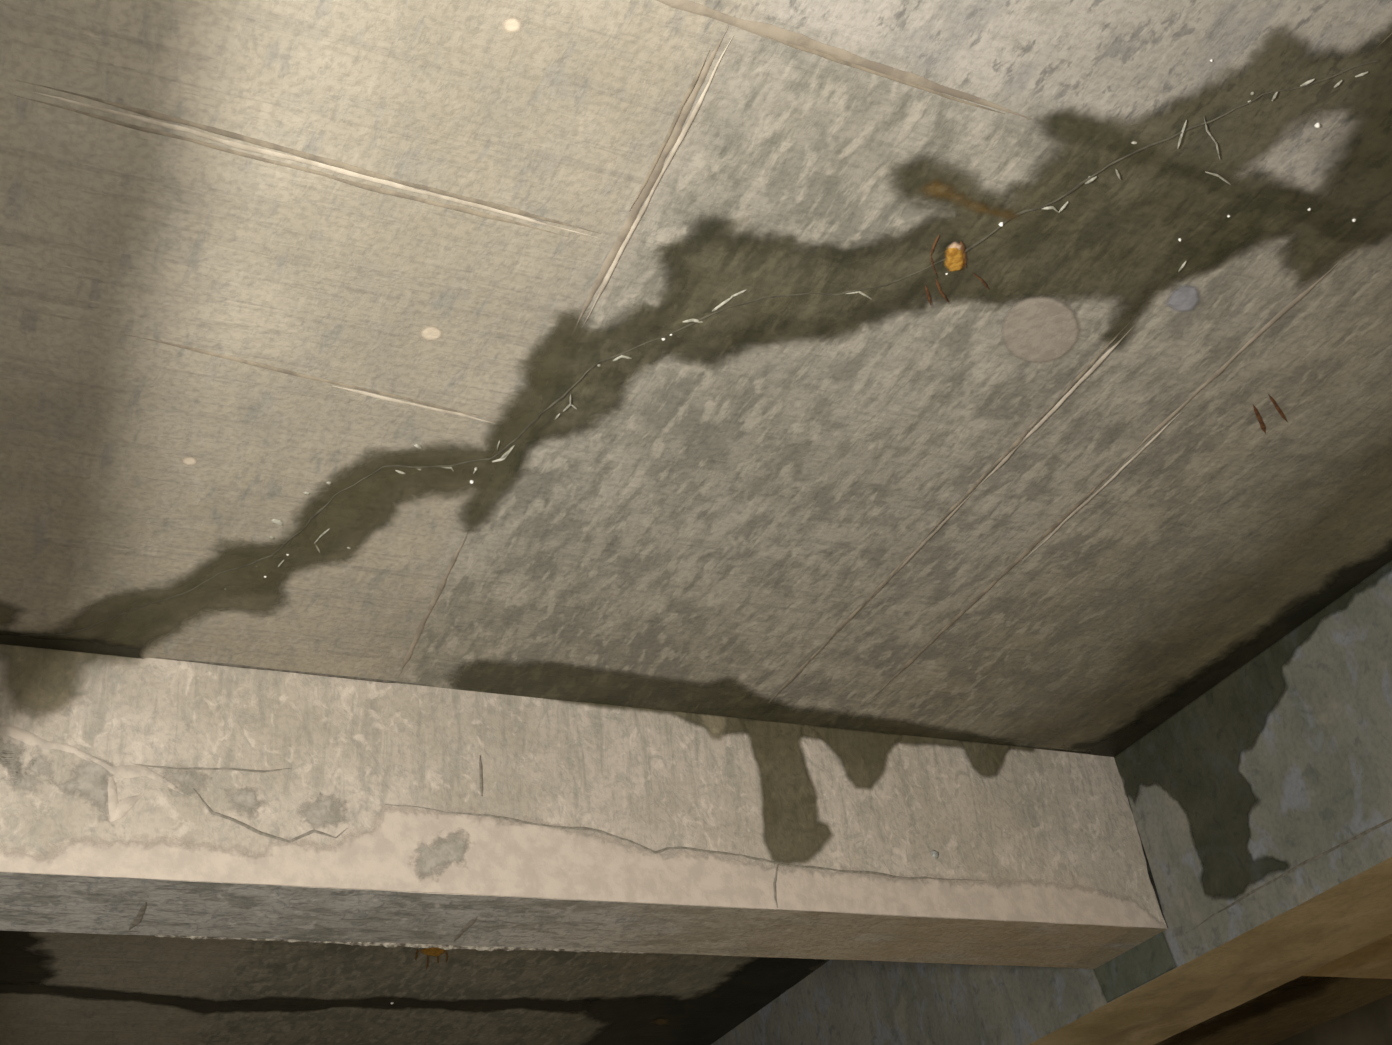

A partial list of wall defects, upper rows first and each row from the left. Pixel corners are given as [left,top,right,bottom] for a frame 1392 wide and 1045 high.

rust [925,235,989,305]
water stain [0,29,1392,715]
rust [1253,394,1287,434]
water stain [453,443,1392,1002]
spalling [0,739,112,820]
crack [136,764,346,842]
spalling [416,832,468,878]
crack [385,757,984,908]
water stain [0,931,54,984]
rust [415,947,448,970]
water stain [584,957,831,1045]
water stain [1169,976,1339,1045]